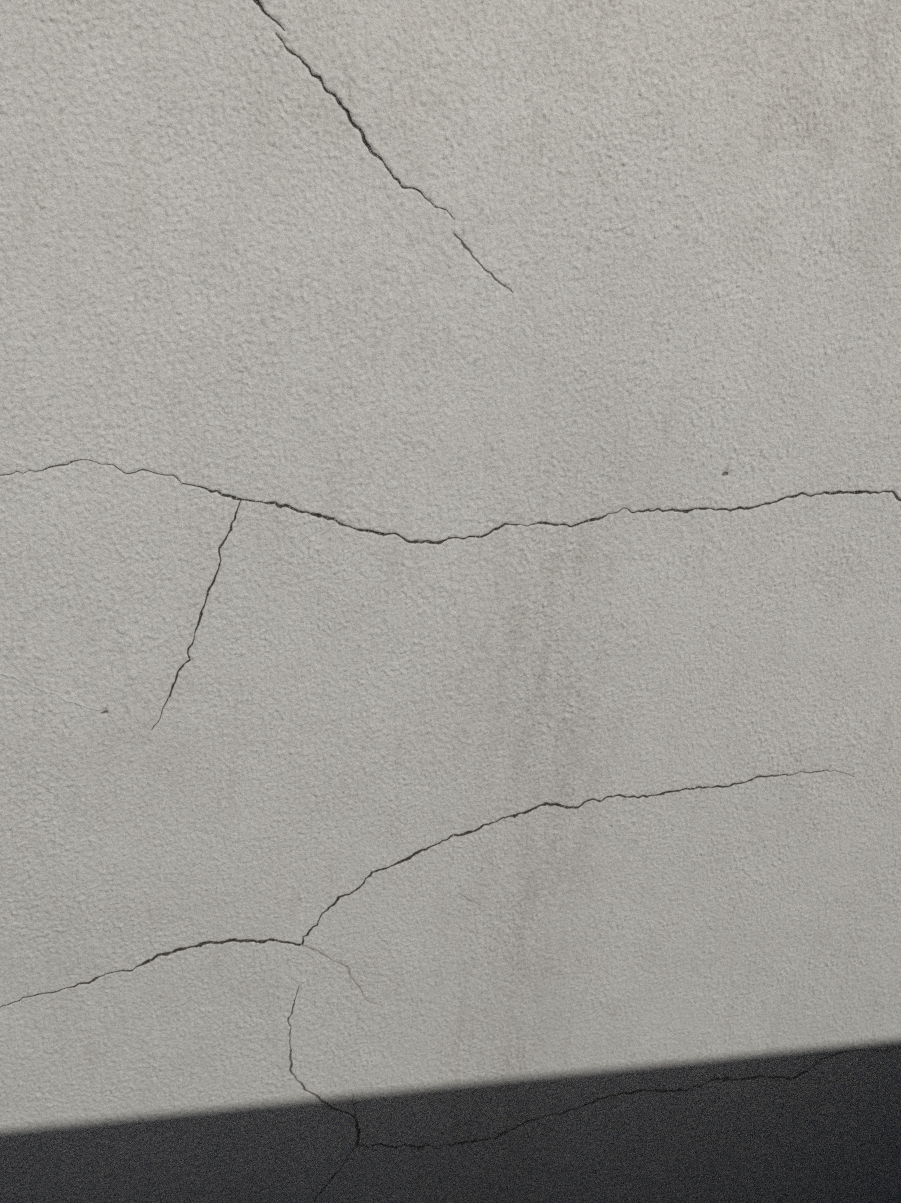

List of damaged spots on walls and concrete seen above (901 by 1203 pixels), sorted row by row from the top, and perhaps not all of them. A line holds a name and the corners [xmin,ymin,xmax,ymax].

crack [253,0,514,293]
crack [0,459,901,729]
crack [0,770,855,1008]
crack [288,986,901,1203]